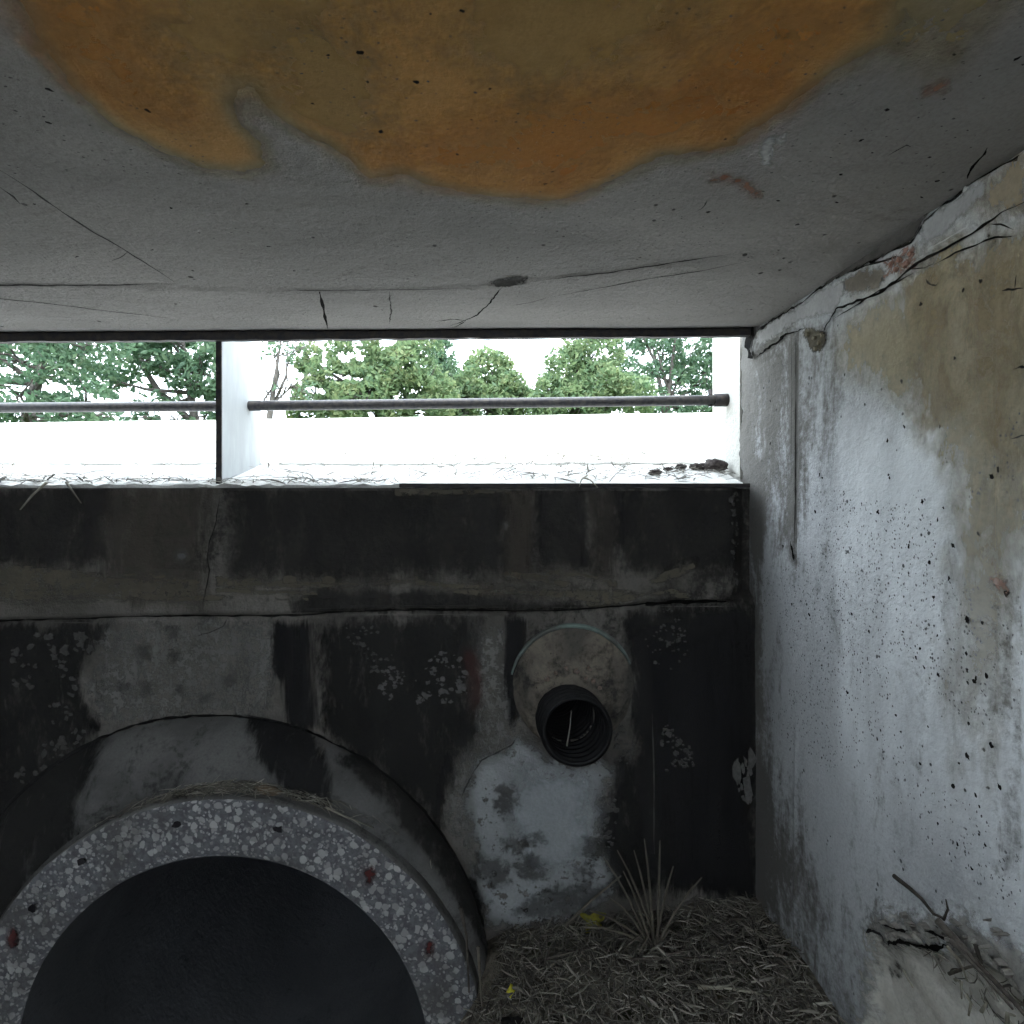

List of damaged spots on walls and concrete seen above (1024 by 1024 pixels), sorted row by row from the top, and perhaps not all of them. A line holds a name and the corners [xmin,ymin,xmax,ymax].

rust [16,0,991,202]
crack [0,170,174,282]
crack [319,292,328,329]
crack [436,263,737,327]
spalling [825,213,927,285]
crack [744,149,1024,359]
water stain [841,237,1024,573]
crack [0,491,726,637]
water stain [0,489,756,954]